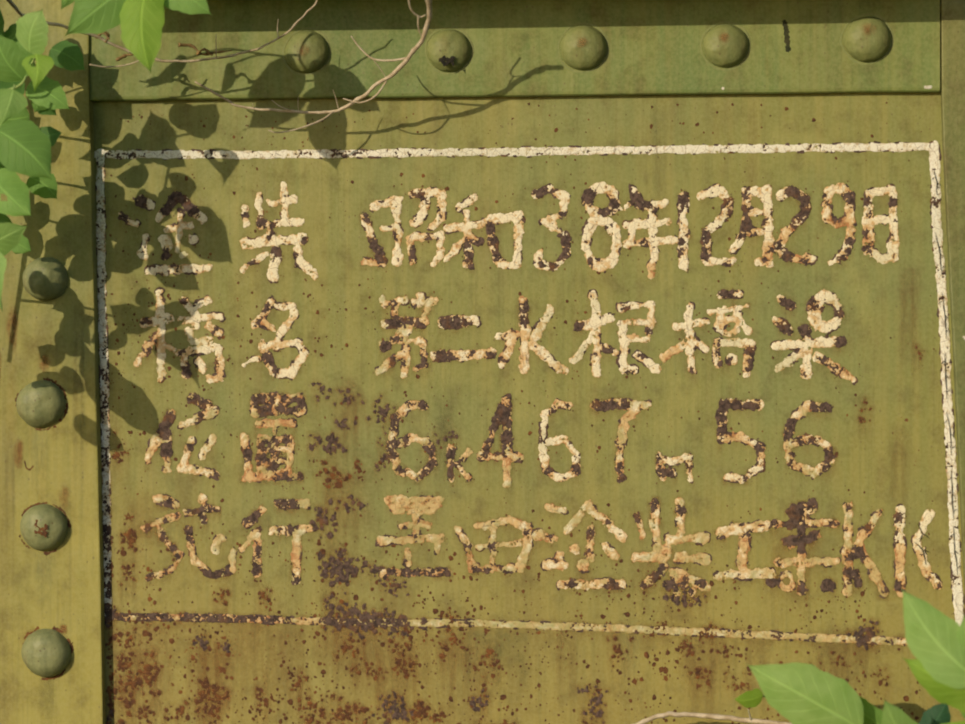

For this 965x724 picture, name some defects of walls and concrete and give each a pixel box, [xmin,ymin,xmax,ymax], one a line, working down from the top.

peeling [240,212,309,270]
rust [102,253,206,415]
peeling [97,269,475,629]
rust [21,502,71,528]
rust [104,377,760,724]
peeling [489,620,679,636]
peeling [691,627,905,646]
rust [770,579,889,707]